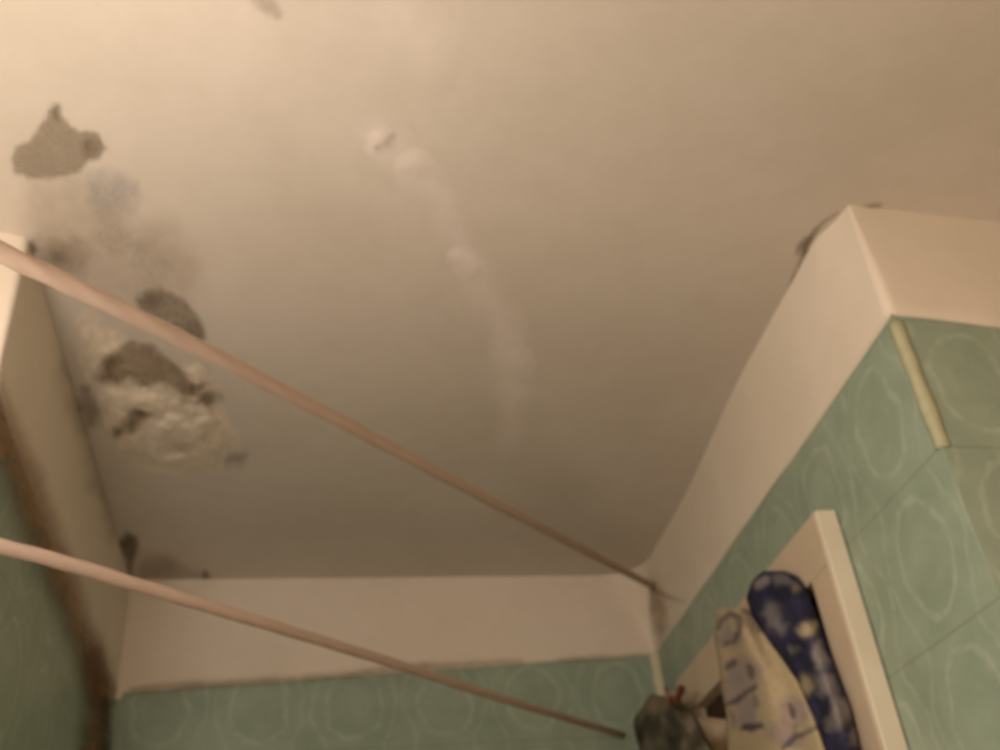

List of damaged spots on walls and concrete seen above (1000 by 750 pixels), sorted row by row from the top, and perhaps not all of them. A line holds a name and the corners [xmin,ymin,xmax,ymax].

peeling [14,109,103,177]
spalling [139,290,203,338]